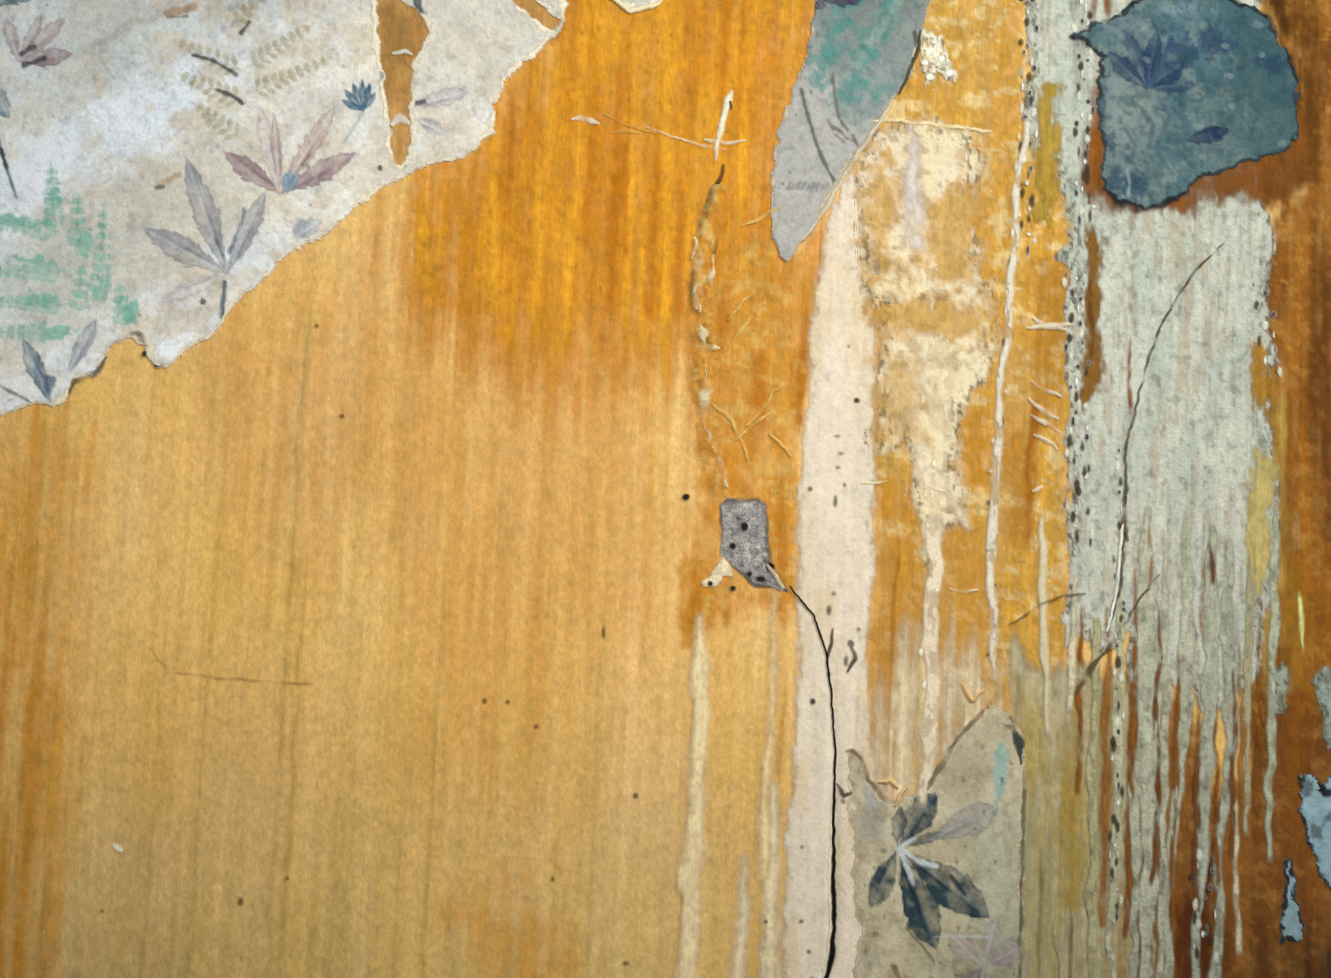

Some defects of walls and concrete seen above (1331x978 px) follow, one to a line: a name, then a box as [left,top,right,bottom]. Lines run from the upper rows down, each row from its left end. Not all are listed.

damp [412,0,816,385]
peeling [920,29,957,85]
peeling [702,118,1008,978]
peeling [1009,0,1289,978]
crack [790,585,857,978]
damp [1009,637,1138,978]